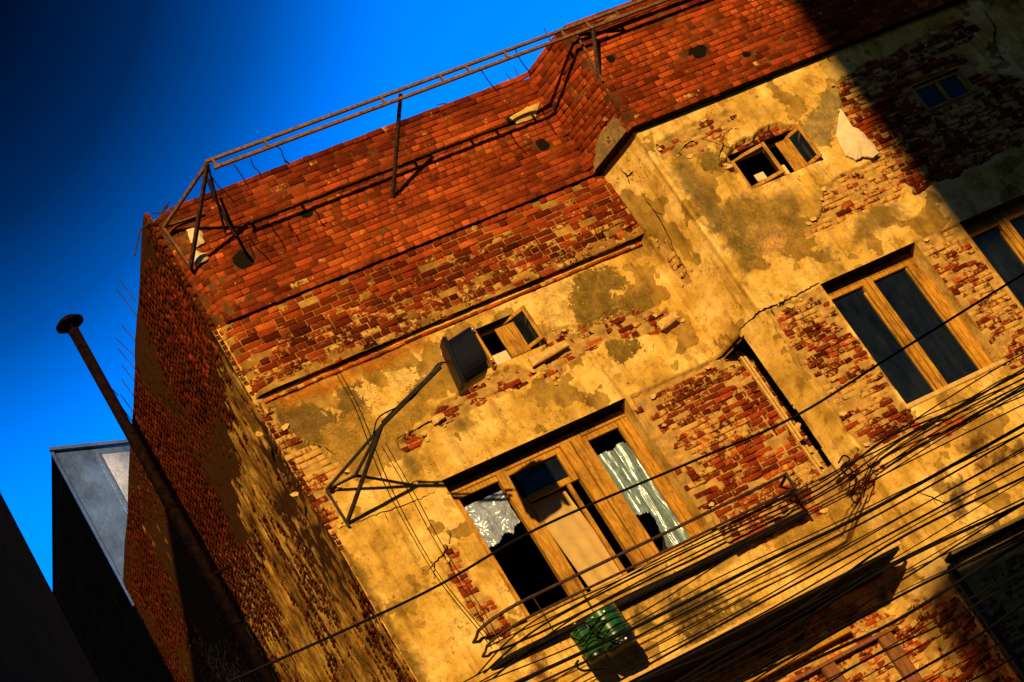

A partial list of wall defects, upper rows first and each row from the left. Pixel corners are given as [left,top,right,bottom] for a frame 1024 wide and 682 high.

spalling [736,18,1024,239]
crack [622,171,680,259]
leakage [674,148,805,272]
leakage [852,205,901,244]
crack [739,283,818,331]
spalling [635,350,829,544]
spalling [776,296,969,507]
spalling [444,548,511,643]
spalling [697,596,1019,682]